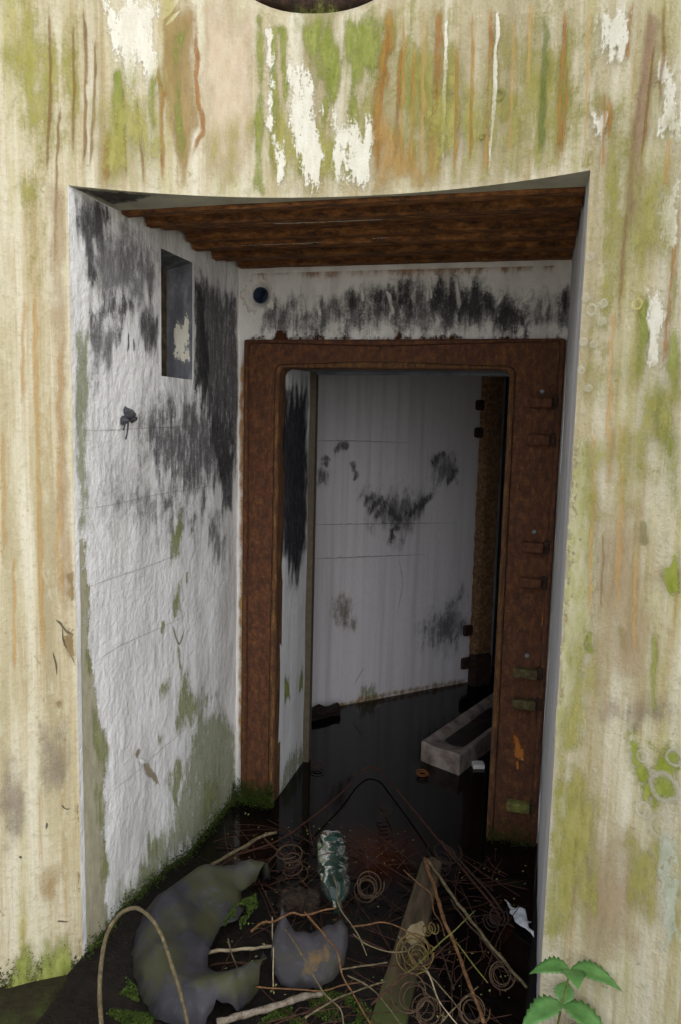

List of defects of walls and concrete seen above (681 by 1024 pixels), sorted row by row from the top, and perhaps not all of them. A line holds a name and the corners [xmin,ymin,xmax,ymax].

peeling [594,0,633,63]
corrosion [157,69,165,174]
peeling [265,28,375,194]
corrosion [373,11,493,176]
corrosion [557,16,568,152]
peeling [591,111,608,140]
peeling [657,54,681,141]
peeling [655,179,680,255]
corrosion [252,330,350,340]
water stain [636,298,649,375]
peeling [646,287,666,368]
corrosion [513,733,524,769]